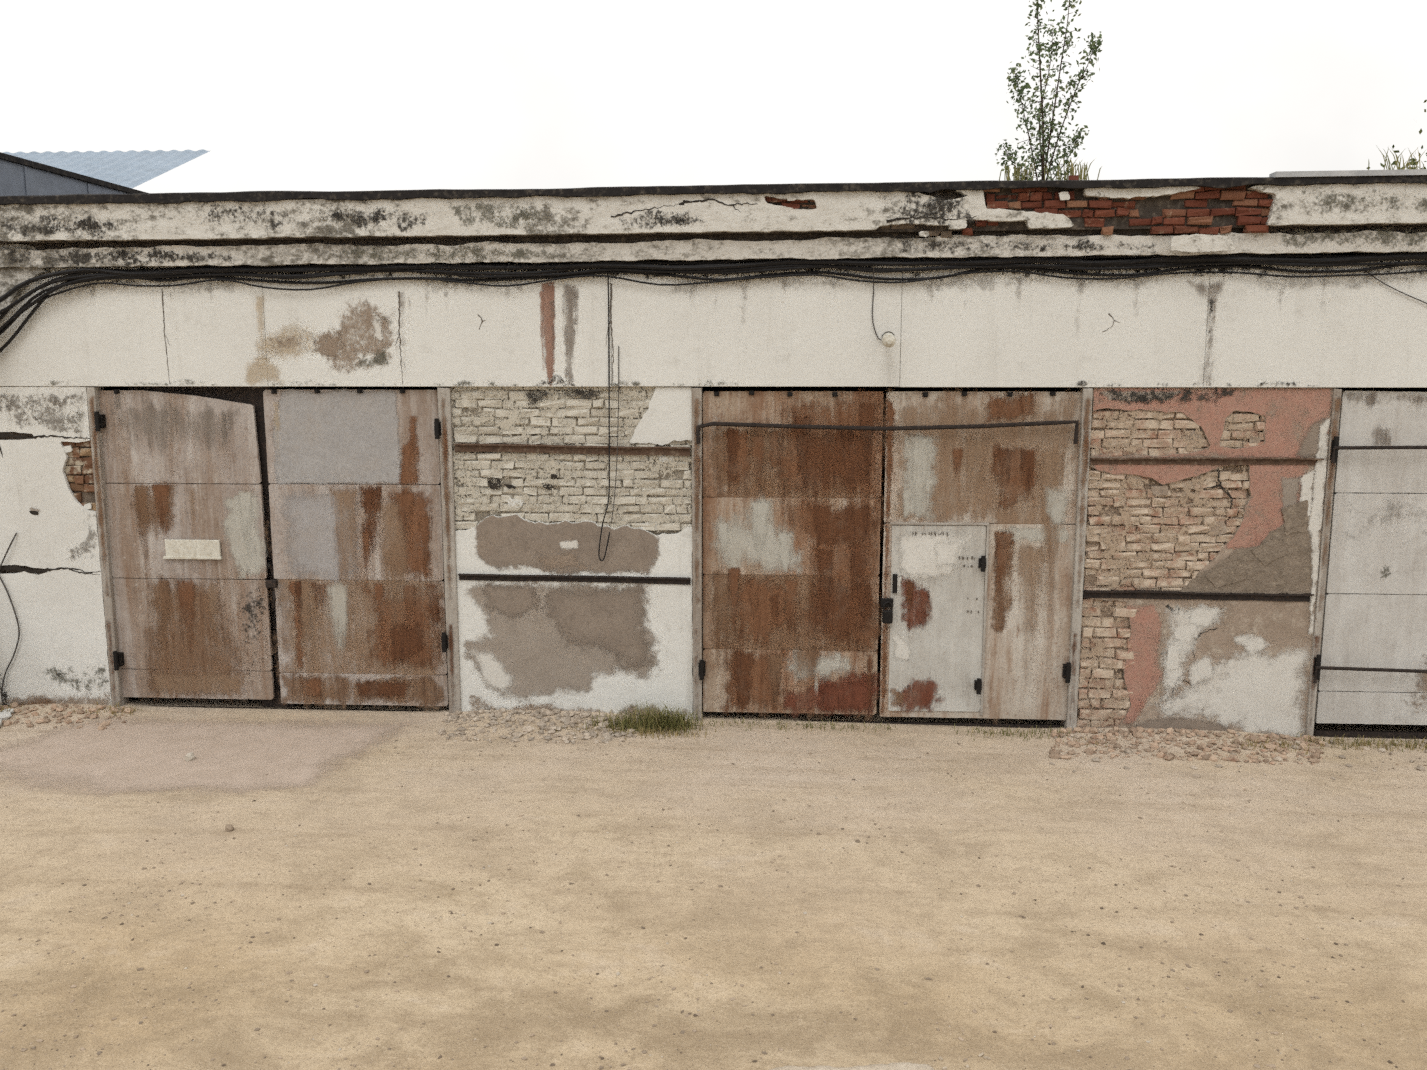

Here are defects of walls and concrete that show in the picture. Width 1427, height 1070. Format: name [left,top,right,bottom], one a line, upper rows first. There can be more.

leakage [1,214,234,294]
rust [539,282,555,385]
leakage [619,210,703,229]
spalling [881,175,1273,253]
leakage [883,189,1427,345]
crack [0,433,90,457]
spalling [0,387,97,559]
rust [145,576,244,697]
rust [279,403,453,707]
spalling [451,375,692,698]
rust [694,393,1090,717]
spalling [1076,388,1333,731]